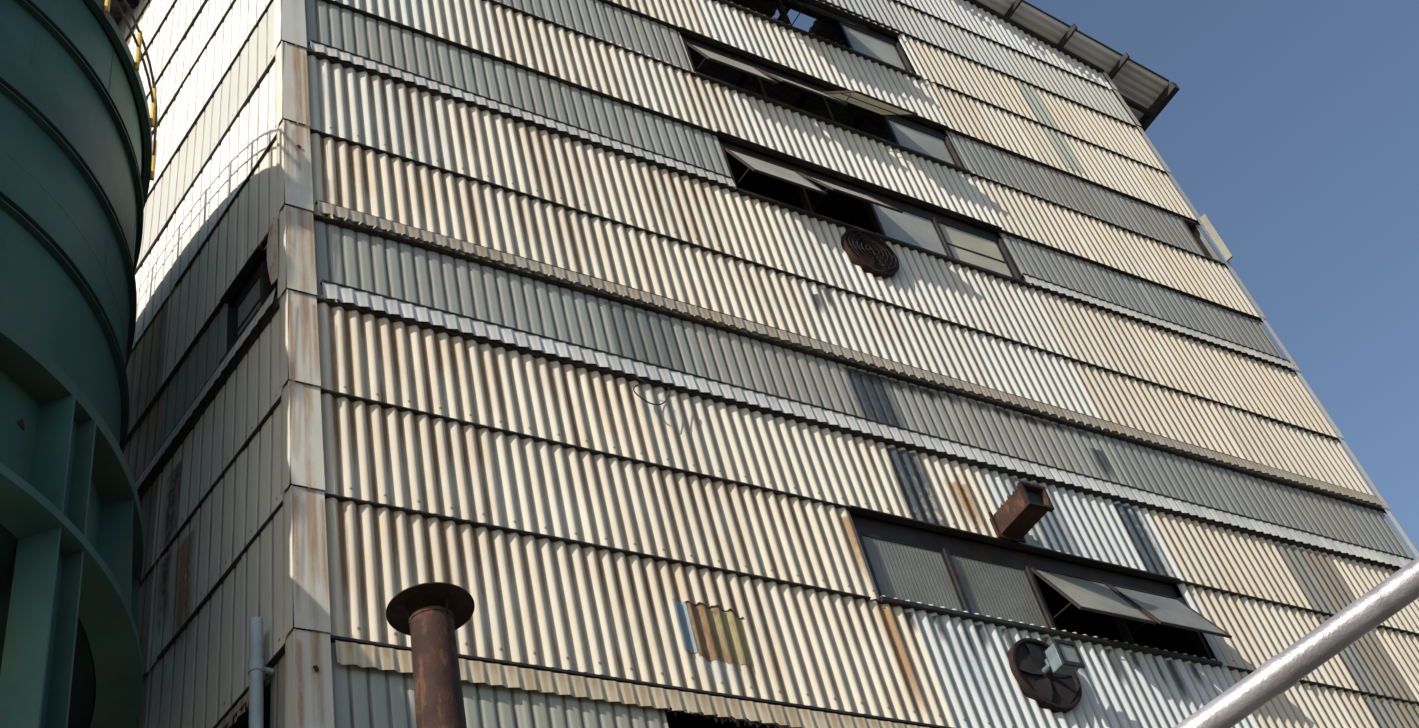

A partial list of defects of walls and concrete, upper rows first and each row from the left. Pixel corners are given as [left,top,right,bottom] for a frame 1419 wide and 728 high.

corrosion [313,305,352,386]
corrosion [159,463,192,626]
corrosion [322,501,345,582]
corrosion [842,516,865,564]
corrosion [298,641,319,728]
corrosion [880,608,915,687]